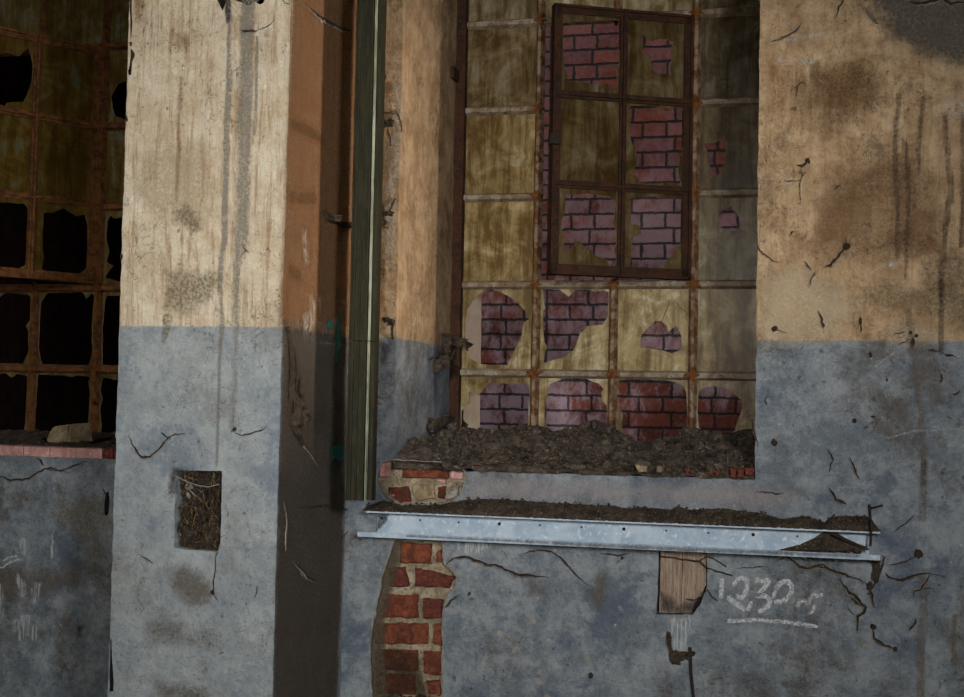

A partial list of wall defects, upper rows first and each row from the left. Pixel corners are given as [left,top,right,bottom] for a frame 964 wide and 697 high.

hole [218,0,264,10]
water stain [824,96,964,260]
water stain [162,0,258,462]
crack [0,457,88,482]
crack [128,432,186,460]
spalling [376,459,467,506]
crack [445,549,591,586]
flaking render [368,538,458,697]
crack [444,591,471,609]
crack [738,549,946,652]